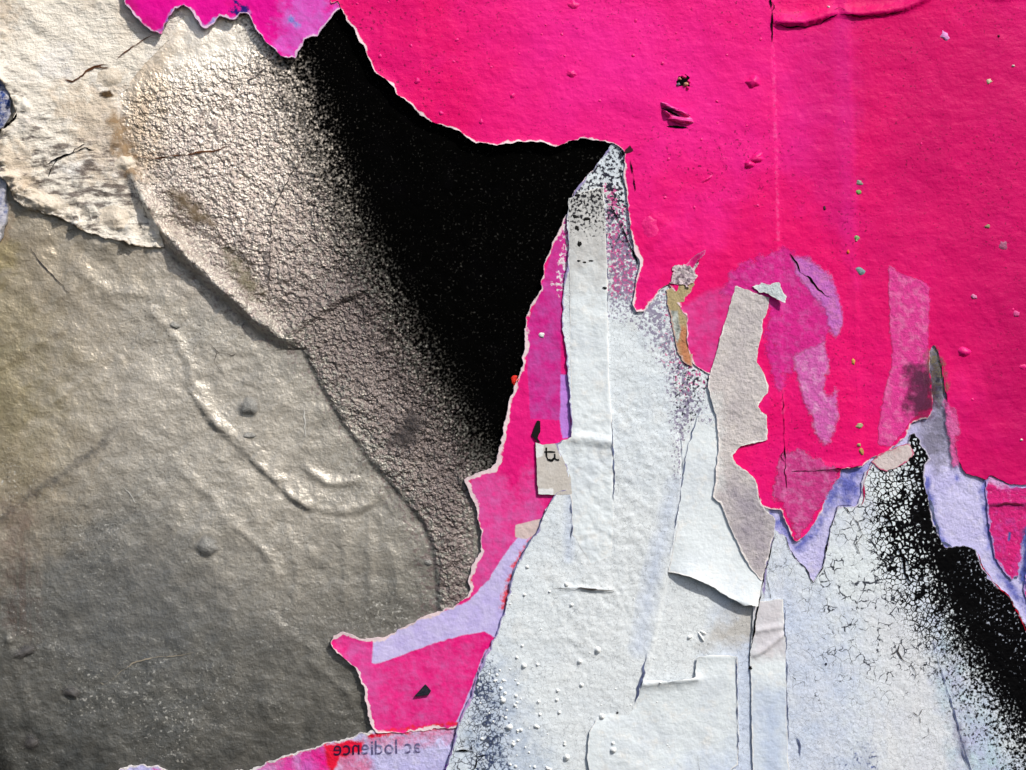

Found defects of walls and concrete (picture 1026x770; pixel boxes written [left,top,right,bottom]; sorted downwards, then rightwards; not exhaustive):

crack [790,254,831,298]
peeling [532,420,541,443]
crack [846,506,912,584]